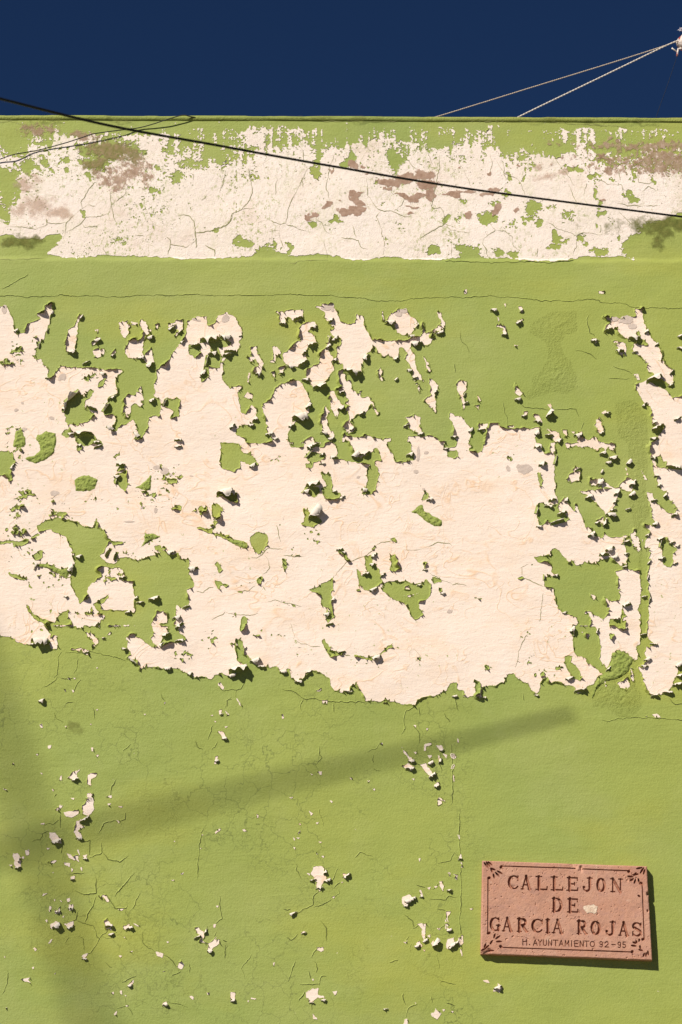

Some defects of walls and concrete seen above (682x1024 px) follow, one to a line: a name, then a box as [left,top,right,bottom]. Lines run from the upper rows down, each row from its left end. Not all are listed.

crack [10,182,126,250]
damp [70,130,153,193]
peeling [0,122,682,262]
crack [138,146,660,264]
damp [587,136,682,179]
crack [0,258,682,355]
peeling [0,300,682,707]
peeling [401,725,459,806]
peeling [41,769,123,880]
crack [33,779,190,1015]
crack [368,694,462,1018]
peeling [404,910,464,957]